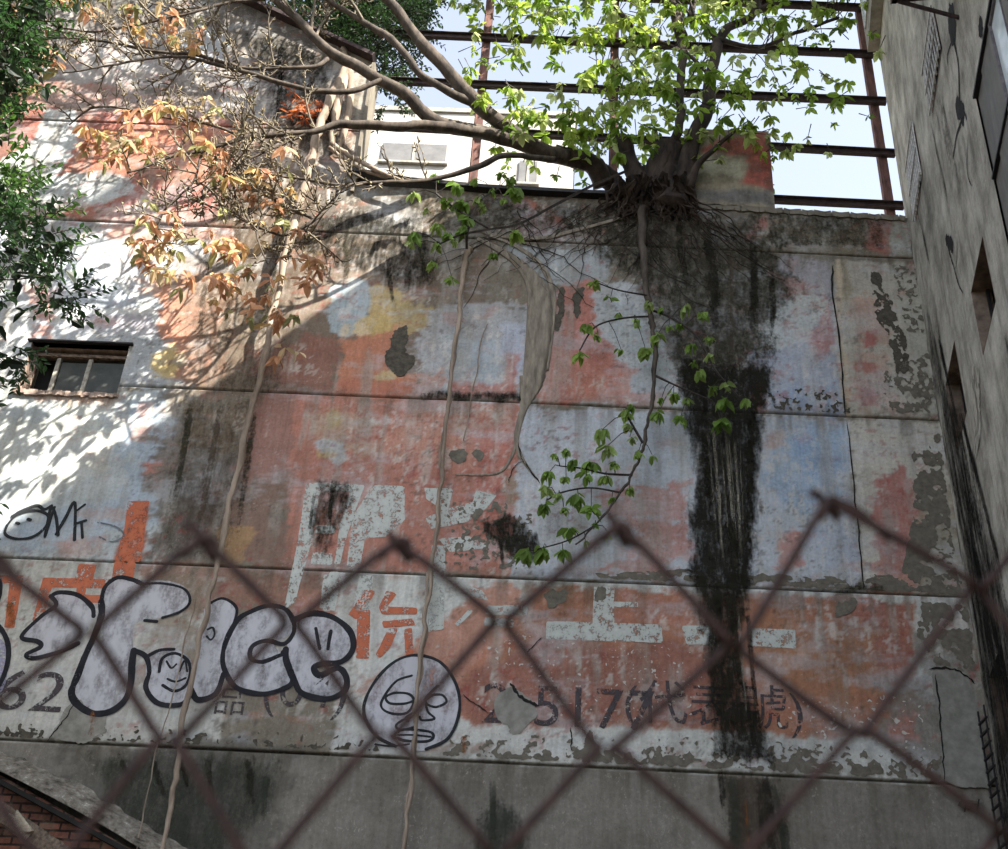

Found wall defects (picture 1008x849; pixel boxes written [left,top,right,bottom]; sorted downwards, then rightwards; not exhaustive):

spalling [385,325,415,376]
peeling [871,265,937,413]
water stain [167,405,237,546]
water stain [232,417,256,505]
water stain [248,195,883,763]
spalling [443,433,991,812]
spalling [0,699,141,744]
peeling [286,734,364,750]
crack [931,666,975,780]
water stain [101,752,272,849]
water stain [477,787,524,849]
water stain [718,774,790,849]